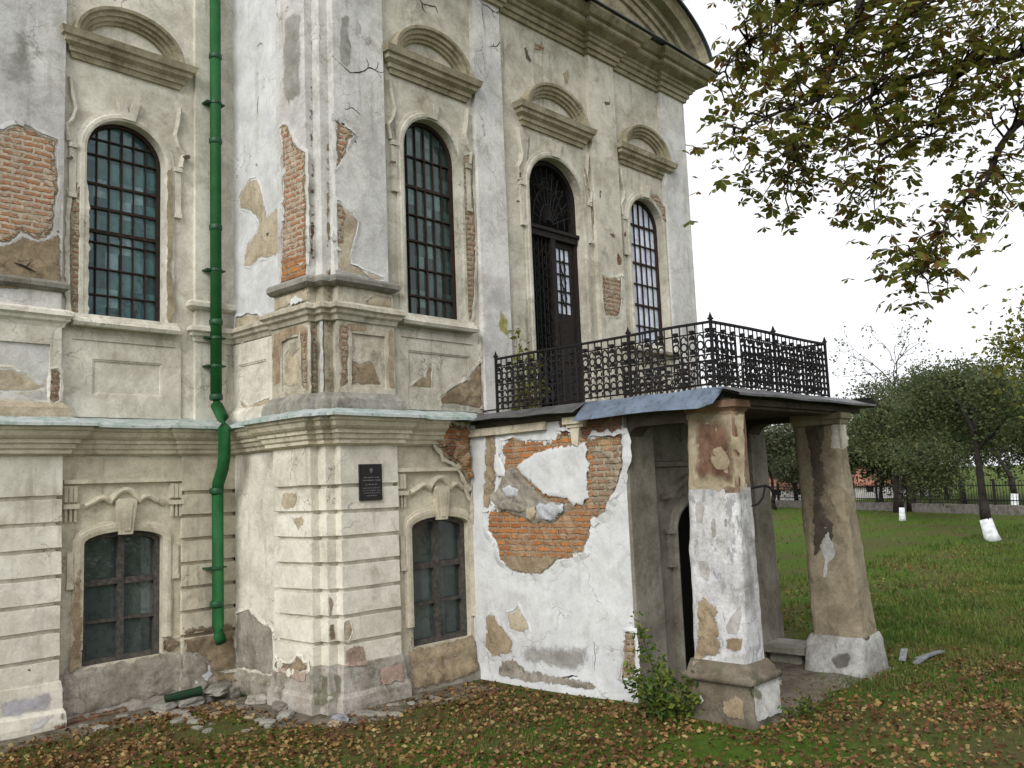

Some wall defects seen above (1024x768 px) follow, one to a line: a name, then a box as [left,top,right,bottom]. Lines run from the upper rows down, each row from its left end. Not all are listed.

crack [339,58,383,77]
spalling [0,117,90,314]
spalling [233,109,393,328]
spalling [600,253,624,320]
spalling [410,340,632,584]
spalling [31,569,310,731]
spalling [409,601,596,690]
spalling [692,597,742,666]